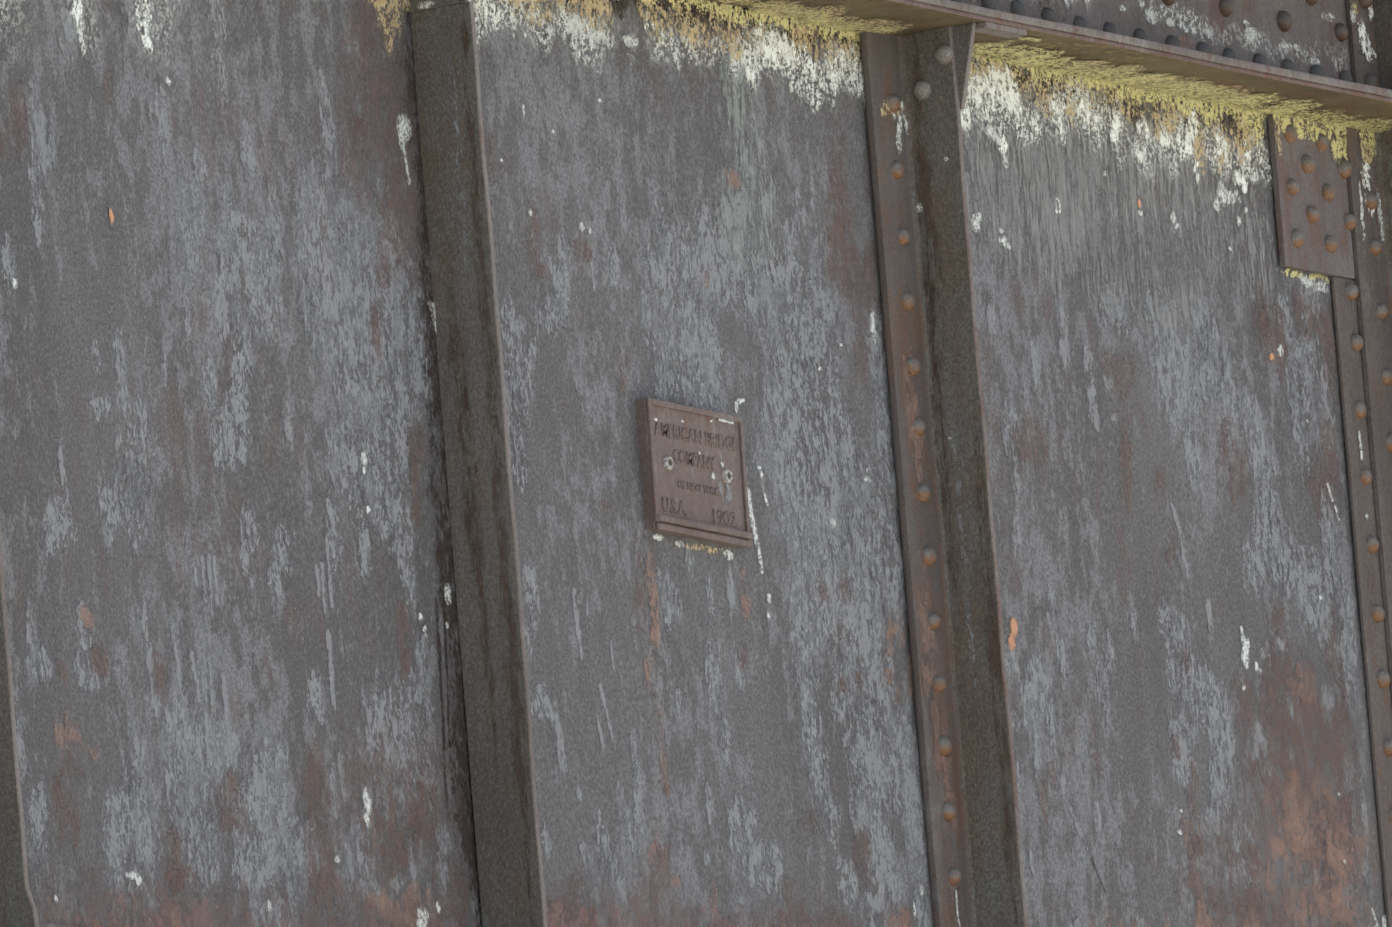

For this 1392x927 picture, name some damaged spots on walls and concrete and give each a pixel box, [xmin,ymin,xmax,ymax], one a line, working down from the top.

peeling [27,74,57,248]
damp [469,0,865,277]
damp [960,54,1331,337]
efflorescence [1148,0,1263,51]
peeling [10,608,53,863]
peeling [90,326,155,553]
peeling [101,0,454,927]
peeling [500,232,570,493]
peeling [641,156,933,927]
peeling [1004,581,1102,839]
peeling [1057,292,1127,432]
peeling [1100,272,1373,914]